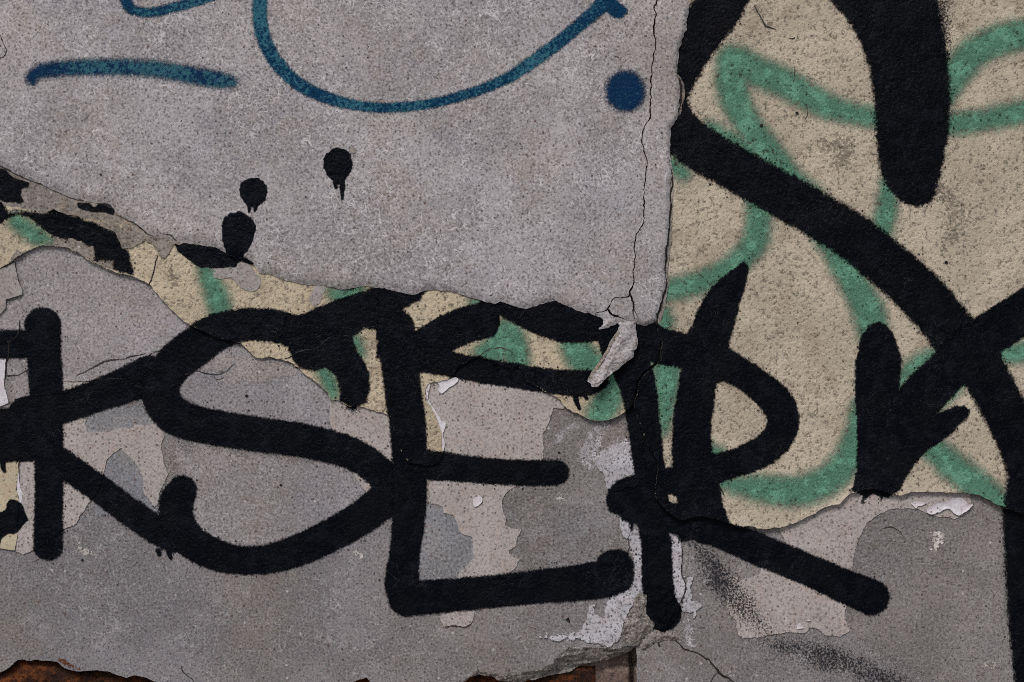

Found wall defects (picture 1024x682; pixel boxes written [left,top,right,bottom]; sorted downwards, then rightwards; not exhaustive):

crack [596,0,673,405]
peeling [0,358,30,406]
peeling [0,236,190,391]
peeling [213,262,261,292]
peeling [179,343,393,463]
peeling [588,321,638,387]
peeling [418,377,702,682]